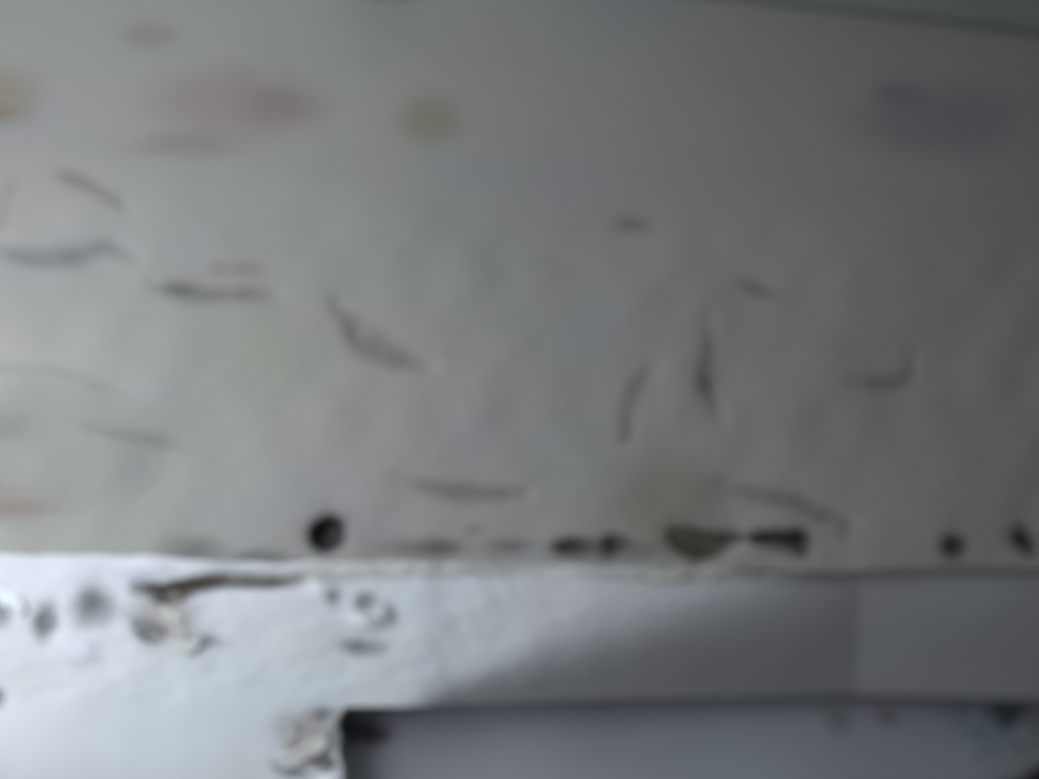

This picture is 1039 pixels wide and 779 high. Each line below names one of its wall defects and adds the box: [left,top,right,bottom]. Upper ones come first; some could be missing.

spalling [553,536,627,555]
spalling [575,527,826,582]
spalling [944,537,964,557]
spalling [1014,529,1036,553]
spalling [228,561,509,602]
peeling [0,585,27,622]
peeling [38,607,54,635]
spalling [134,598,210,654]
peeling [345,595,394,629]
spalling [277,712,339,776]